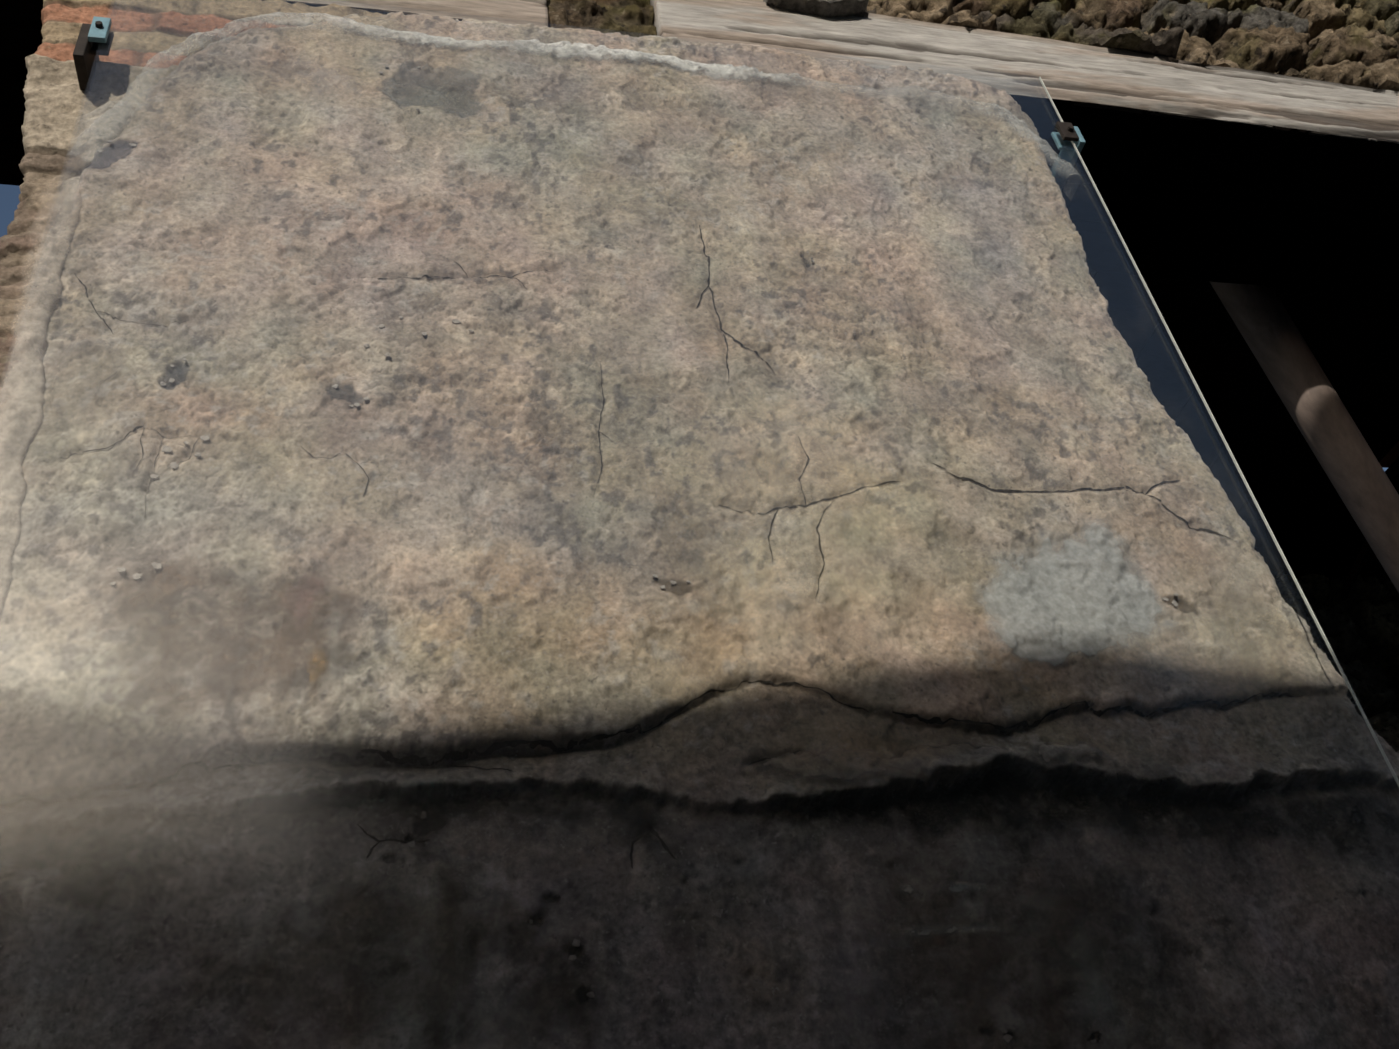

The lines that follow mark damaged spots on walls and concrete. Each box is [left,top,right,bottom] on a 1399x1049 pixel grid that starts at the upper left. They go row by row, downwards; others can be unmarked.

crack [696,225,776,382]
crack [41,425,200,519]
crack [301,446,372,497]
crack [718,436,900,599]
crack [932,463,1233,540]
water stain [117,565,346,708]
water stain [771,763,1399,858]